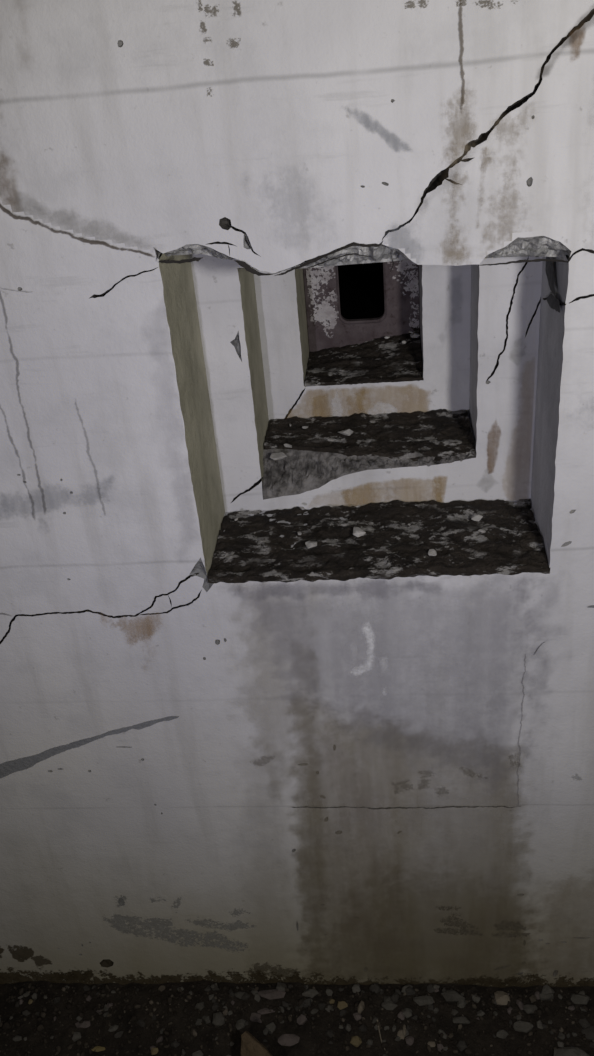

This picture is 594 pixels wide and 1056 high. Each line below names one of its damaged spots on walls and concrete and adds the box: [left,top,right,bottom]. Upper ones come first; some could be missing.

crack [0,3,594,298]
spalling [155,244,235,260]
spalling [230,331,242,361]
peeling [251,244,419,338]
spalling [484,236,571,313]
crack [479,248,594,382]
spalling [262,449,476,499]
crack [0,573,202,644]
efflorescence [351,623,374,676]